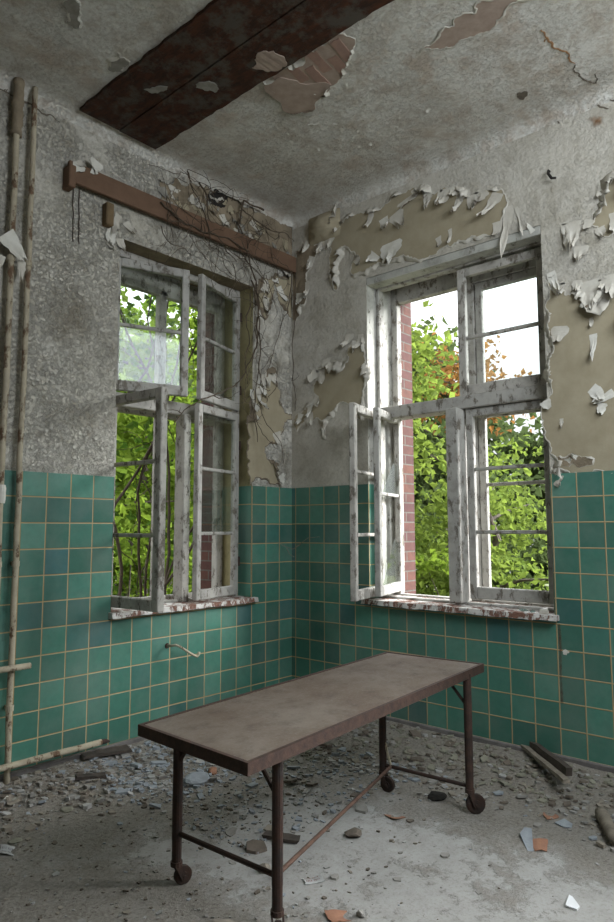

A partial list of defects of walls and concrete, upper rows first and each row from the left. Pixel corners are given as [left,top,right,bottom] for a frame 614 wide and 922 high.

spalling [252,31,356,116]
peeling [420,0,529,52]
crack [540,30,614,109]
peeling [157,176,535,323]
peeling [559,171,614,261]
peeling [246,334,371,487]
peeling [540,270,614,488]